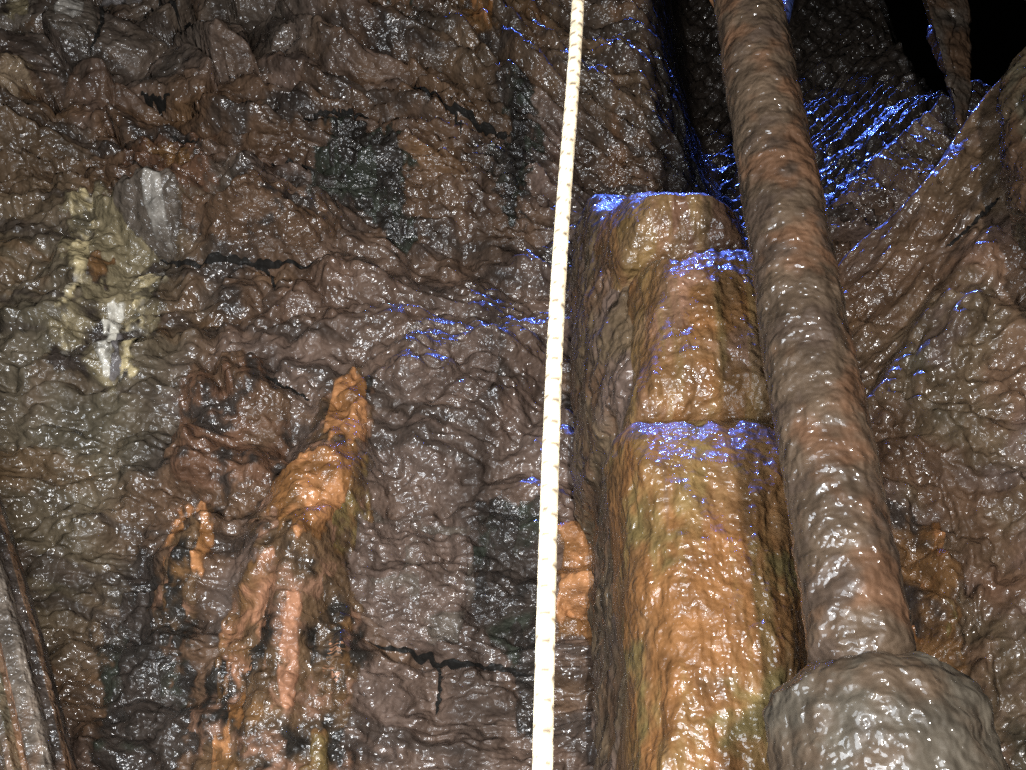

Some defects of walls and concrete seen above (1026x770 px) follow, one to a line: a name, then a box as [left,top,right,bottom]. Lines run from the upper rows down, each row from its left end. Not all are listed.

leakage [308,115,418,253]
leakage [43,180,167,396]
rust [147,501,214,661]
rust [188,366,375,770]
rust [887,500,966,674]
crack [369,641,535,715]